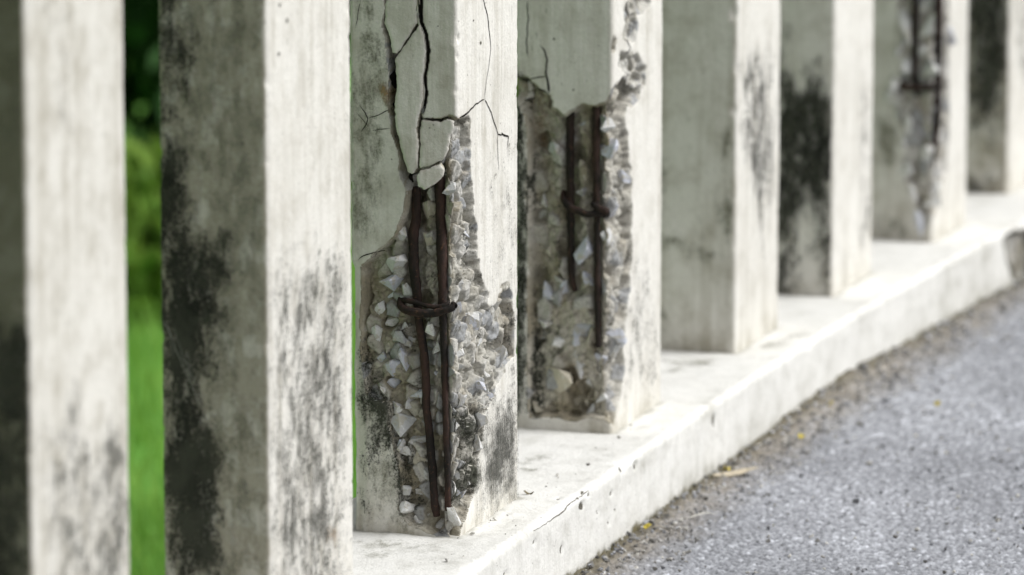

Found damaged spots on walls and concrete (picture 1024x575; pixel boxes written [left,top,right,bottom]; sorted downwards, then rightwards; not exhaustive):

water stain [0,0,132,575]
water stain [158,0,260,575]
water stain [270,235,424,575]
crack [360,55,397,133]
crack [418,0,509,163]
spalling [359,0,651,537]
water stain [724,43,846,296]